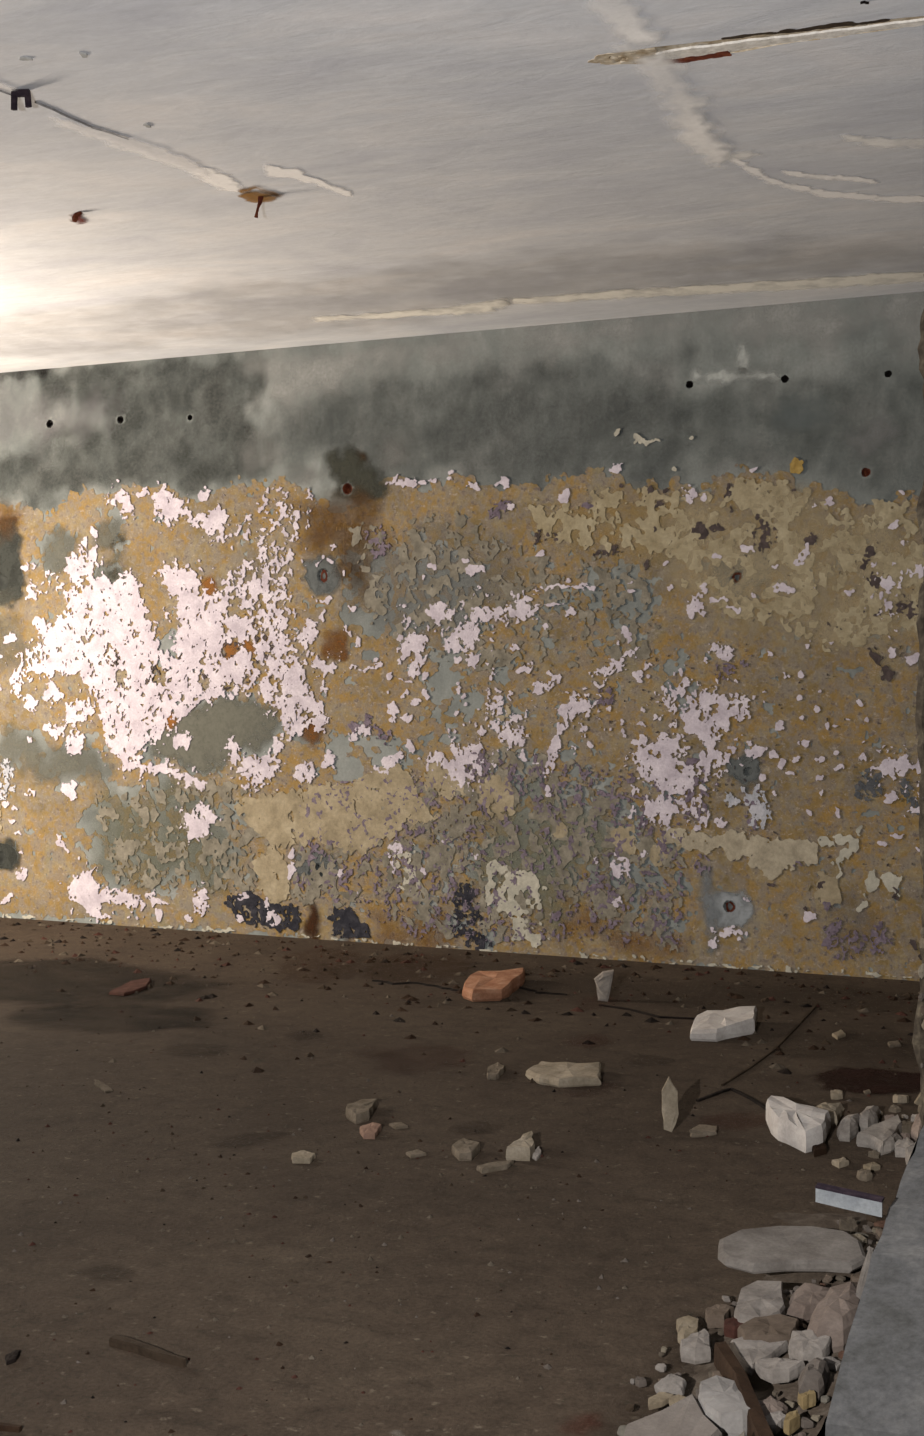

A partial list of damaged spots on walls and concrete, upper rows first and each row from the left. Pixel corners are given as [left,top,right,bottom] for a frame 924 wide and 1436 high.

crack [588,16,924,65]
crack [0,90,129,139]
rust [239,187,281,203]
water stain [0,356,355,509]
peeling [614,428,660,446]
water stain [326,444,402,502]
peeling [0,457,924,1138]
spalling [291,1150,316,1164]
spalling [476,1160,514,1174]
spalling [863,1162,880,1172]